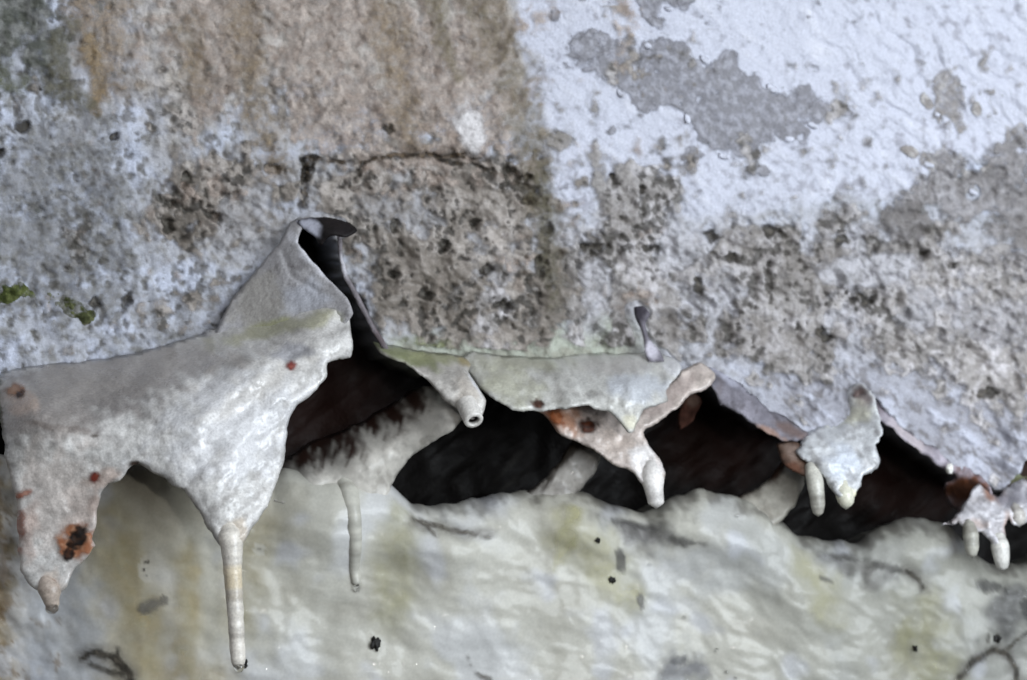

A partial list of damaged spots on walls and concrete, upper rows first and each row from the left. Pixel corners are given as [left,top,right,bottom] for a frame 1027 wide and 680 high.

leakage [615,0,635,36]
peeling [637,0,695,29]
flaking render [0,117,140,325]
flaking render [132,135,289,260]
leakage [180,173,248,201]
leakage [132,0,547,187]
flaking render [542,129,577,168]
peeling [564,28,858,178]
flaking render [861,123,1027,314]
peeling [921,67,982,134]
flaking render [470,287,514,335]
leakage [0,386,1027,680]